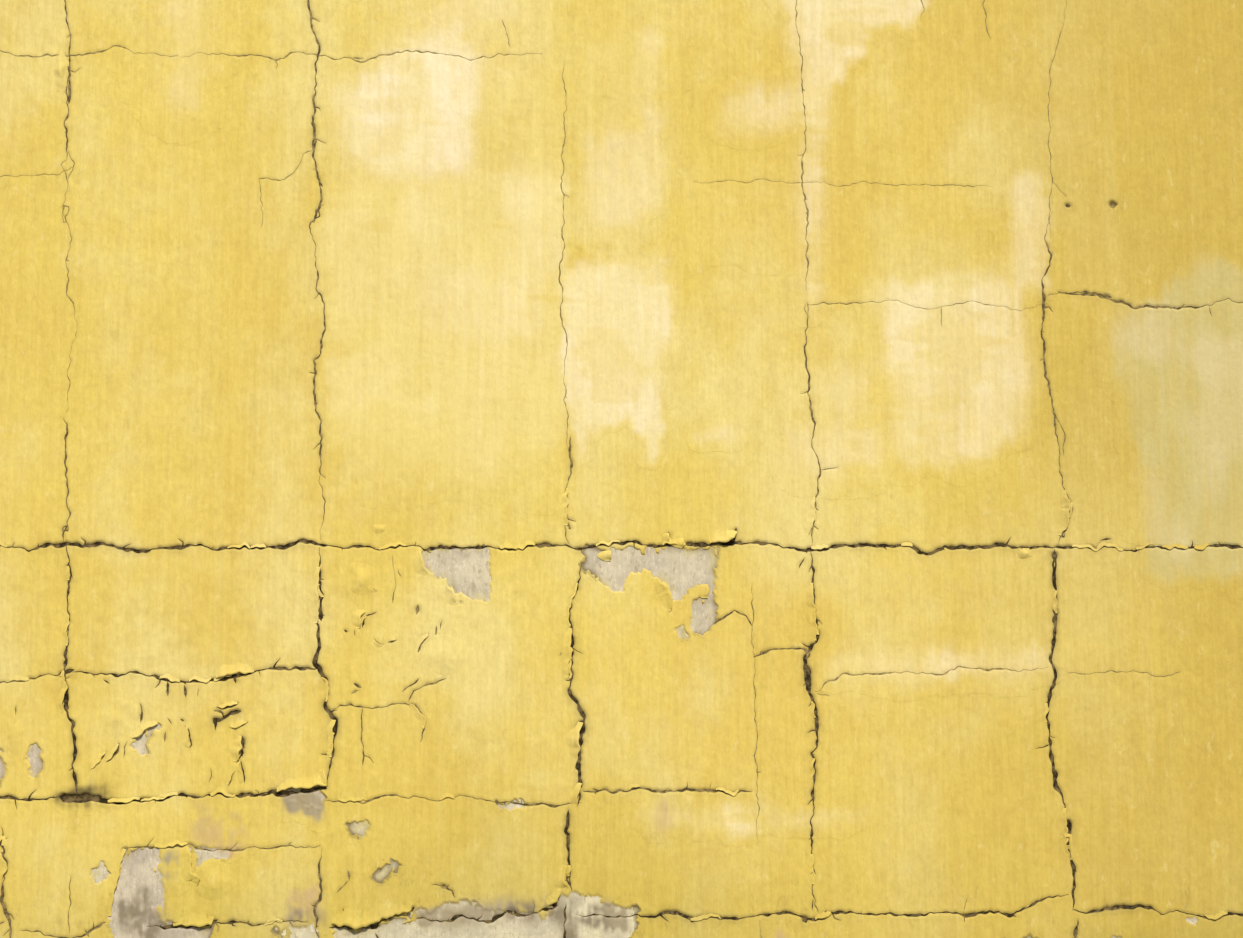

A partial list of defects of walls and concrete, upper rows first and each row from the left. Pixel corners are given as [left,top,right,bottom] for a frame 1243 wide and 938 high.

crack [694,0,985,280]
crack [0,0,539,524]
crack [558,106,569,430]
crack [1056,291,1205,310]
peeling [412,545,491,606]
peeling [579,543,720,640]
peeling [26,743,44,778]
peeling [90,843,158,938]
peeling [372,858,402,884]
peeling [193,923,220,938]
peeling [273,907,439,938]